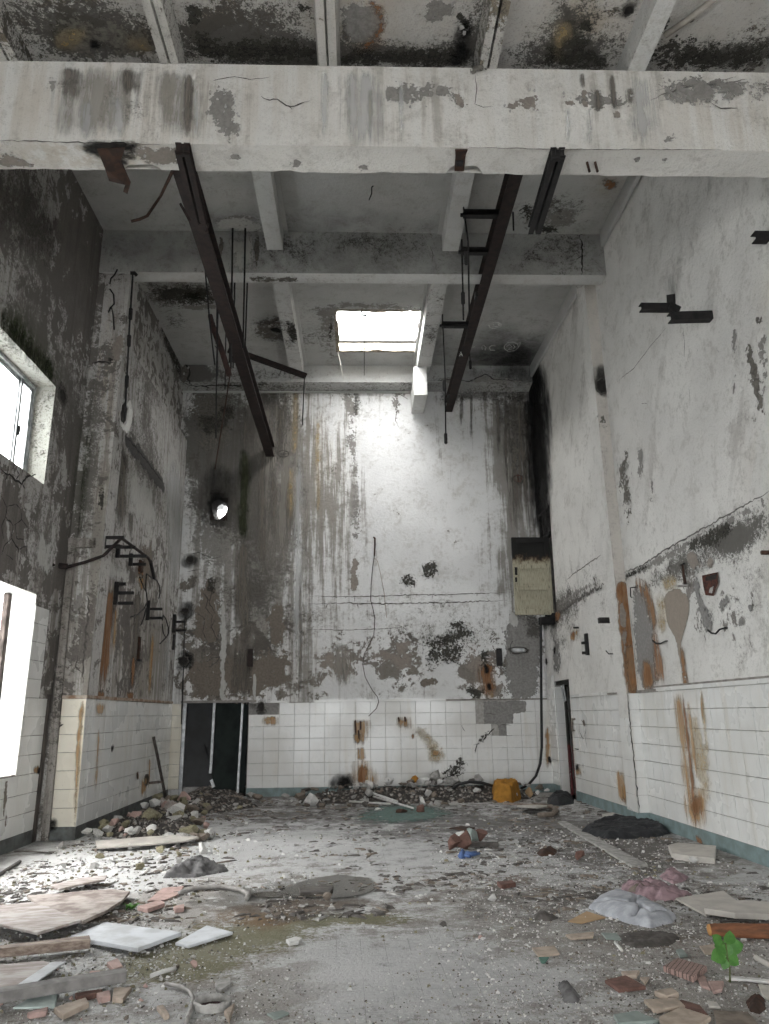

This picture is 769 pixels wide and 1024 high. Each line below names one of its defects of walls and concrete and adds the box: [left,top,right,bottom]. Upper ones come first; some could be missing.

water stain [63,69,137,128]
water stain [161,73,193,131]
peeling [206,85,241,160]
crack [217,76,307,109]
peeling [732,317,768,415]
water stain [441,391,536,524]
crack [1,469,36,566]
flaking render [313,645,355,681]
flaking render [371,637,527,736]
corrosion [616,581,638,693]
corrosion [353,721,374,783]
corrosion [675,698,705,844]